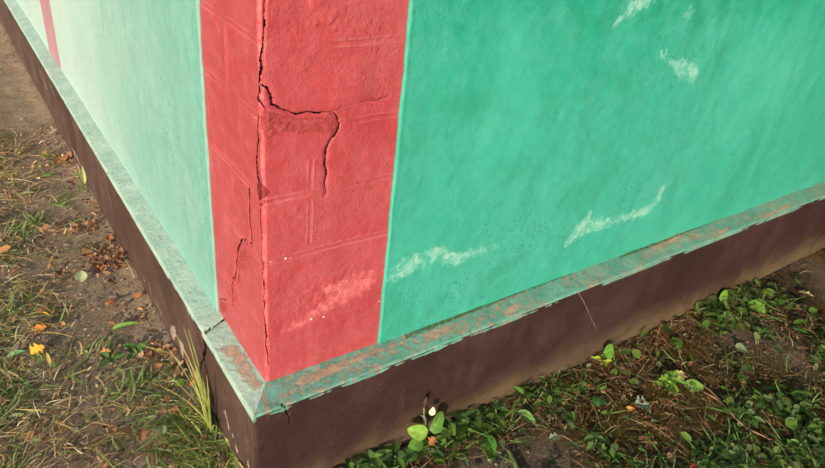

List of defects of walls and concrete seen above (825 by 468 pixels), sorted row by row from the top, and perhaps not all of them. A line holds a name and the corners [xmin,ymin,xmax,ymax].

spalling [257,183,269,206]
crack [200,1,340,370]
peeling [651,233,699,251]
peeling [302,271,373,325]
peeling [420,322,455,342]
peeling [293,340,406,389]